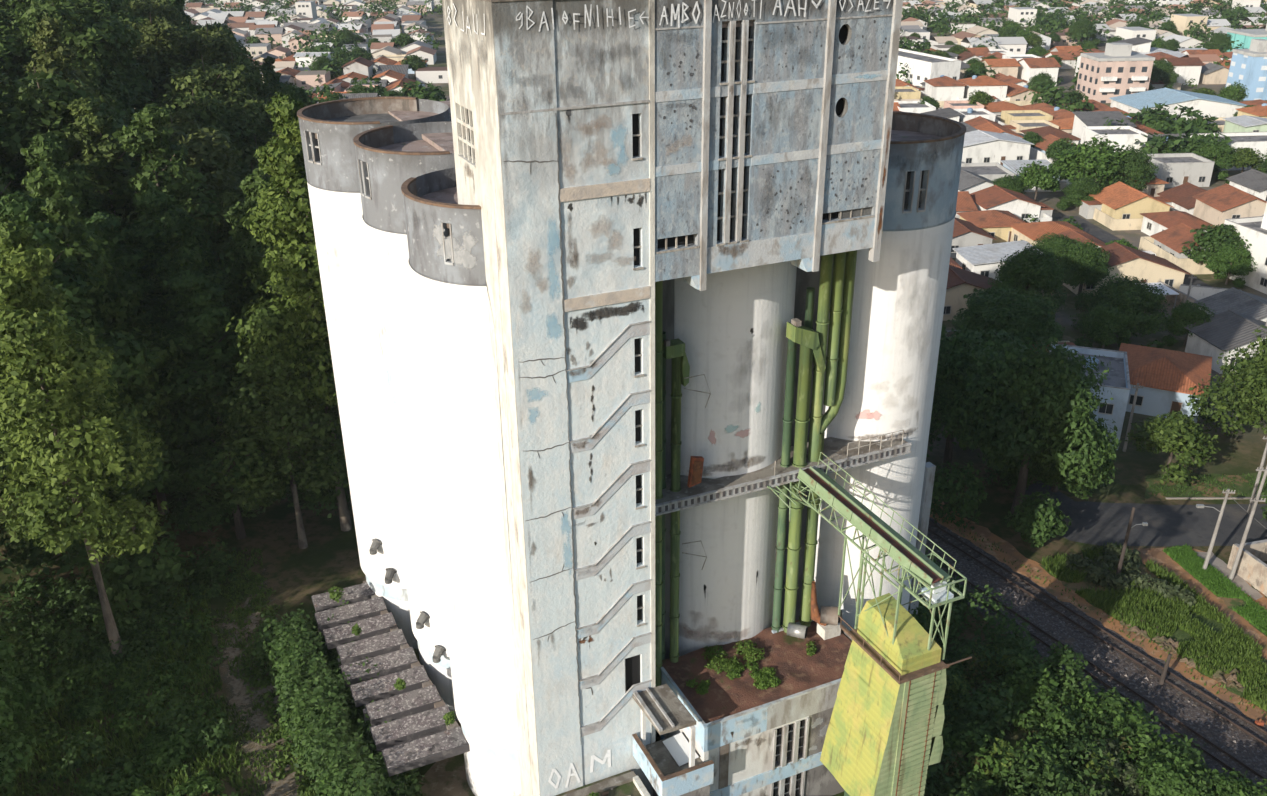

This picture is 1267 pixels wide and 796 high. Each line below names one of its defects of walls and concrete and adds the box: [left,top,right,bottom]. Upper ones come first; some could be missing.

crack [486,113,593,741]